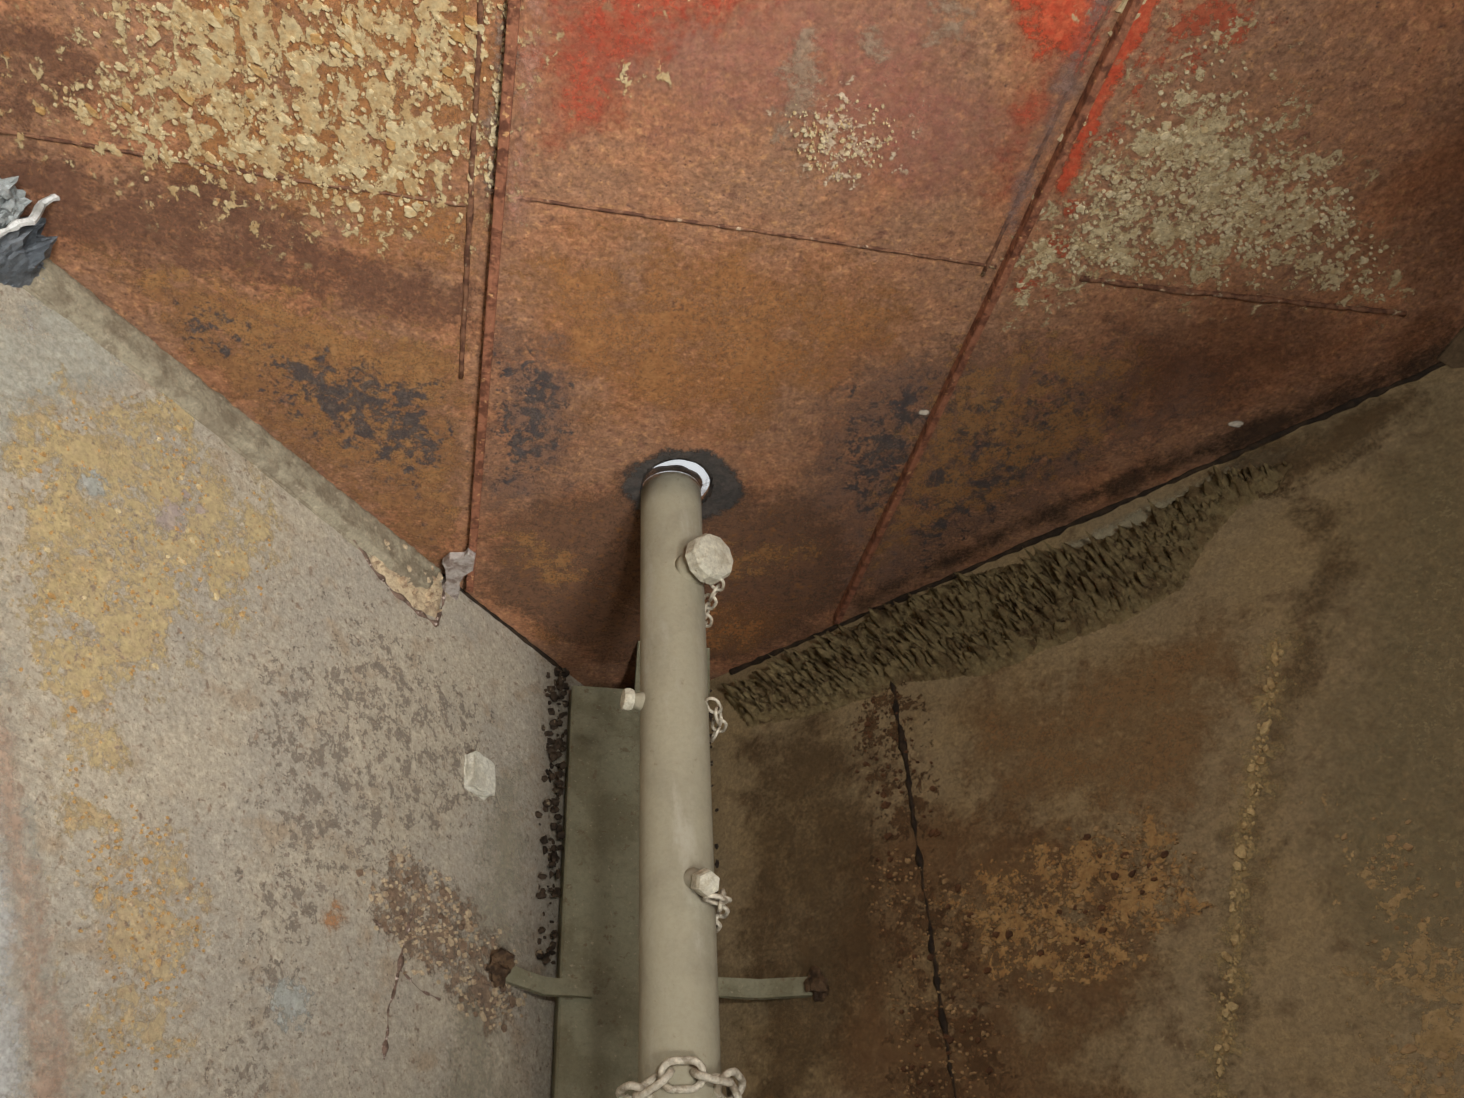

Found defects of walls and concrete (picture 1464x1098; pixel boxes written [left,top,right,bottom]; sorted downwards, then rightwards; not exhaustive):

peeling [0,0,565,260]
rust [156,0,496,270]
peeling [607,59,672,106]
peeling [990,0,1417,332]
rust [85,249,473,563]
rust [476,468,658,663]
rust [690,478,843,661]
damp [794,320,1448,613]
rust [1,365,292,1098]
rust [356,846,527,1036]
rust [846,678,1214,1098]
damp [1195,631,1315,1098]